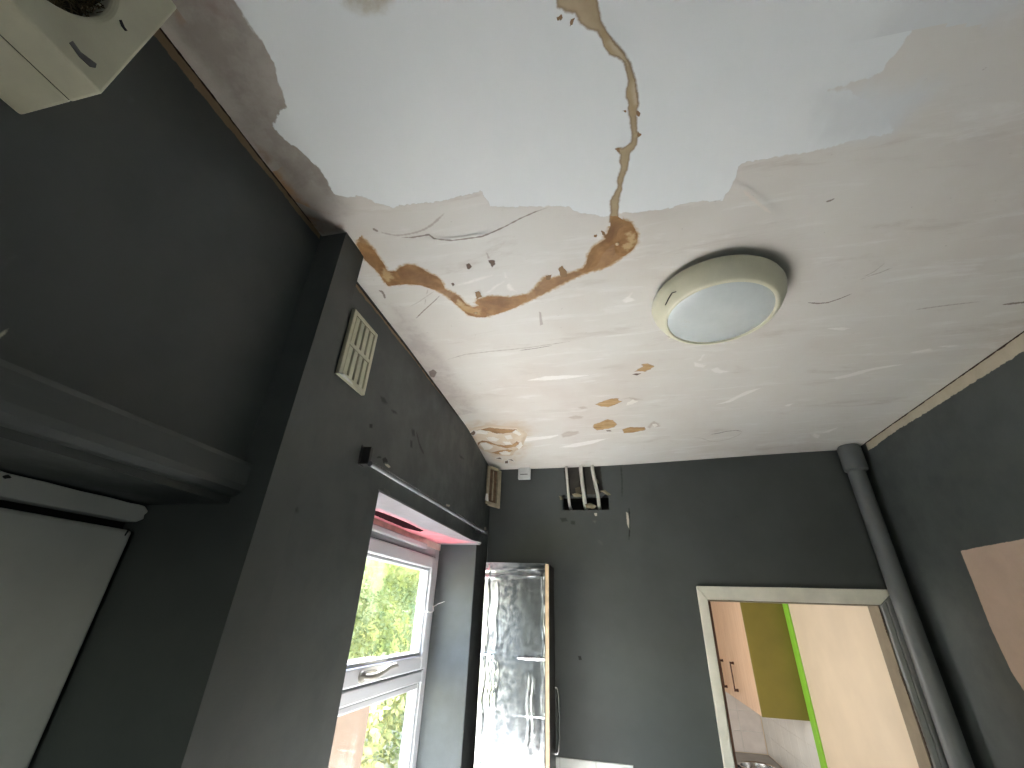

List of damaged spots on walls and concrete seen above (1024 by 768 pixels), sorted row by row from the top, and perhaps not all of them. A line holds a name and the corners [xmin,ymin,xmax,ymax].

water stain [160,0,646,416]
spalling [463,251,498,271]
peeling [628,361,658,377]
peeling [864,331,1024,454]
peeling [459,396,663,469]
spalling [558,466,611,527]